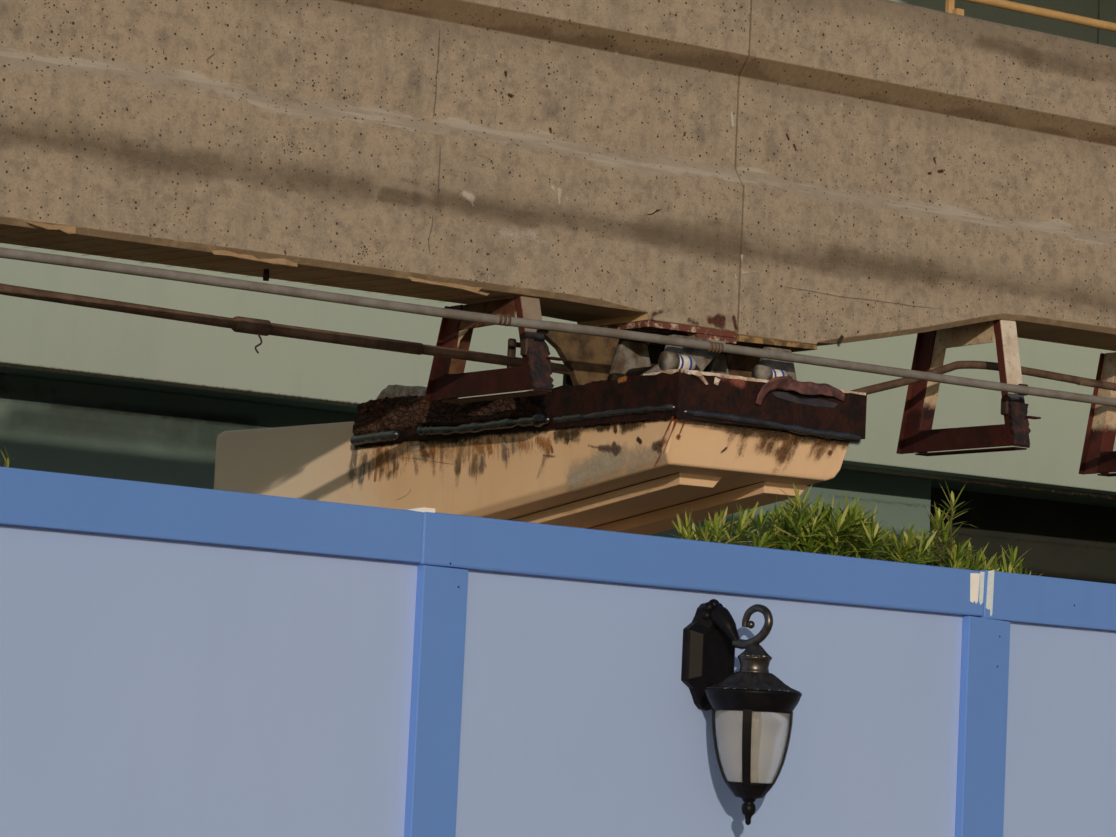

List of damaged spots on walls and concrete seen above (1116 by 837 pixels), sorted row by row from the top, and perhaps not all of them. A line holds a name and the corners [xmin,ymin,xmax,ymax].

rust [347,395,554,483]
leakage [420,419,667,456]
rust [653,416,686,467]
leakage [682,421,847,448]
rust [761,432,799,463]